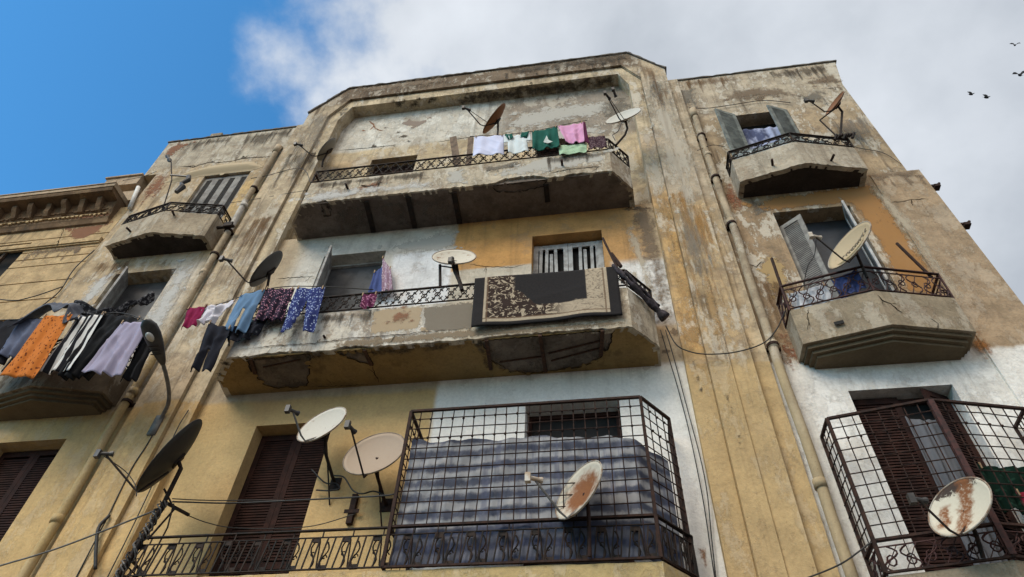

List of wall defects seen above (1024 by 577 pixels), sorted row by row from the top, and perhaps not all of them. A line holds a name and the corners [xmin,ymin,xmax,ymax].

spalling [246,349,313,389]
spalling [333,302,636,375]